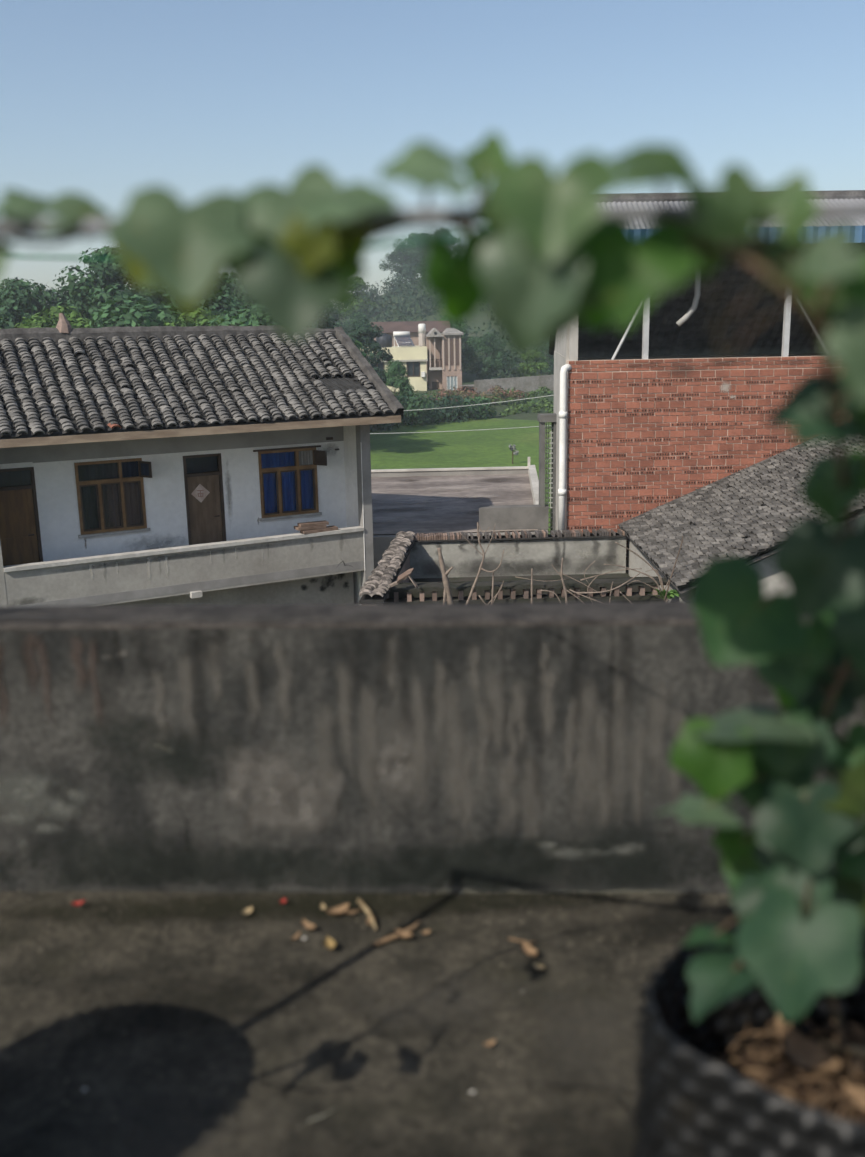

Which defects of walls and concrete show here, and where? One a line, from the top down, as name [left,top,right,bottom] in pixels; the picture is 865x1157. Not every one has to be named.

leakage [325,671,375,793]
leakage [413,665,538,826]
leakage [541,645,556,732]
leakage [566,680,684,821]
leakage [209,840,659,888]